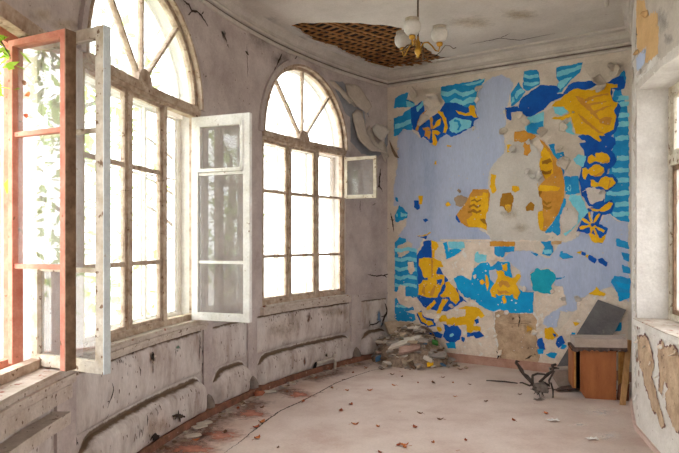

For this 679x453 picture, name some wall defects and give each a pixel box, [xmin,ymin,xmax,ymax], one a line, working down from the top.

crack [183,0,208,26]
flaking render [292,23,446,68]
peeling [329,0,679,434]
crack [369,304,388,327]
crack [224,369,376,453]